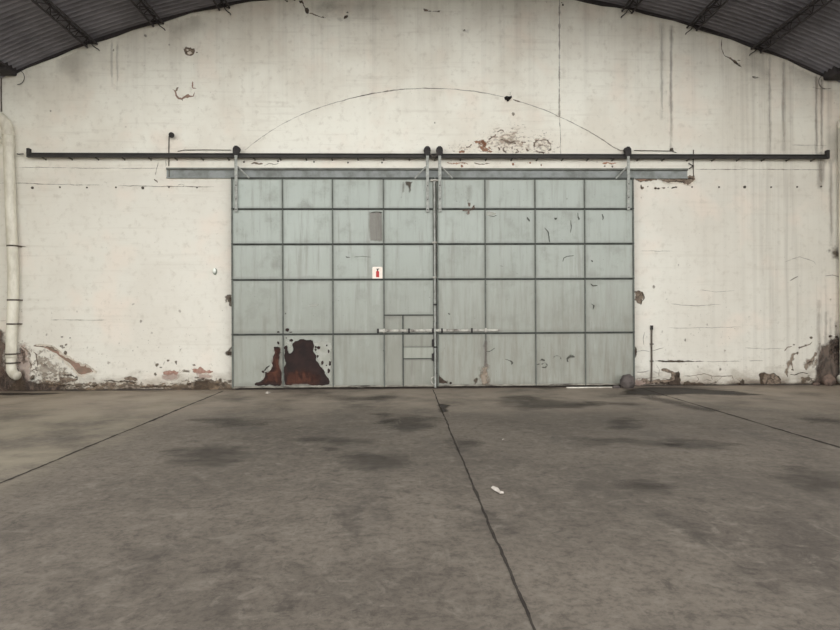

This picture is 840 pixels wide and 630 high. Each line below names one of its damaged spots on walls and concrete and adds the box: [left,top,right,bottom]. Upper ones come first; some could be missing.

peeling [447,130,551,168]
flaking render [636,175,696,190]
flaking render [18,336,232,391]
corrosion [255,328,331,386]
flaking render [759,336,817,384]